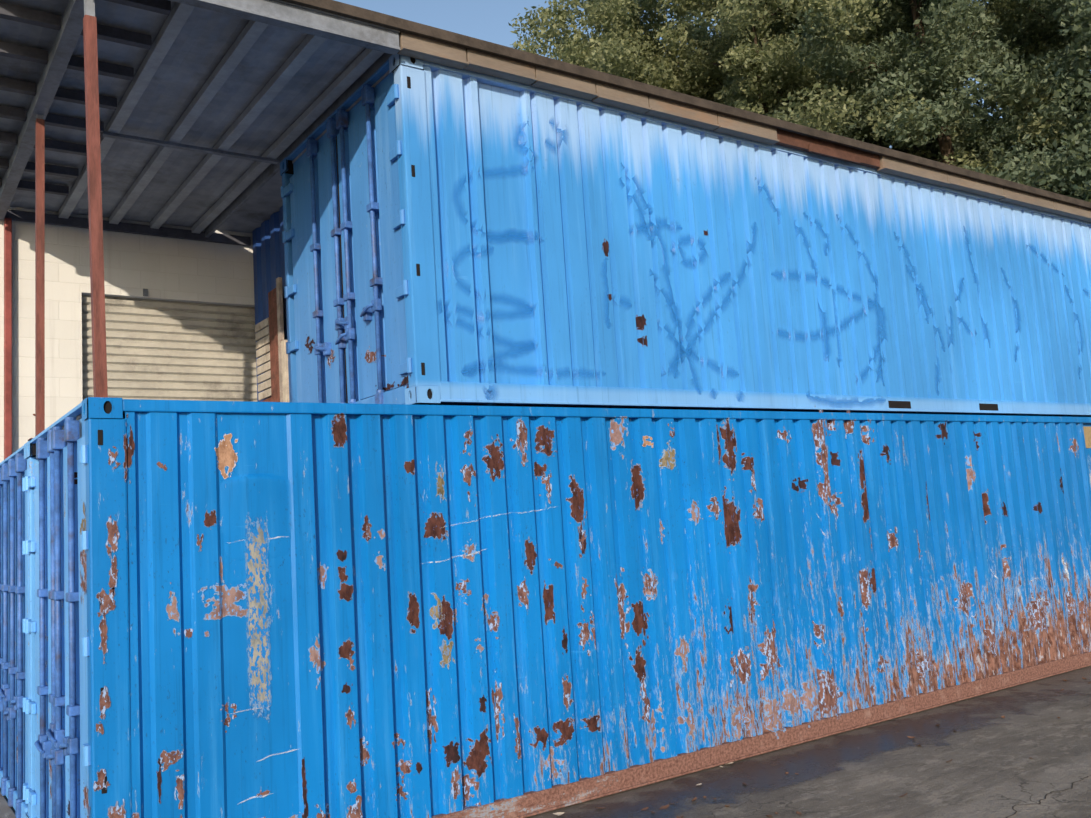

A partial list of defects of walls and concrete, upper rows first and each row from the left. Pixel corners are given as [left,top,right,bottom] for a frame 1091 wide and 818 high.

peeling [214,433,238,479]
corrosion [423,461,449,544]
corrosion [460,416,557,506]
corrosion [566,475,587,558]
corrosion [706,418,764,553]
peeling [198,516,272,722]
corrosion [517,536,563,615]
corrosion [543,577,596,656]
corrosion [338,637,356,729]
corrosion [156,749,185,818]
corrosion [426,674,601,810]
crack [1006,775,1091,818]